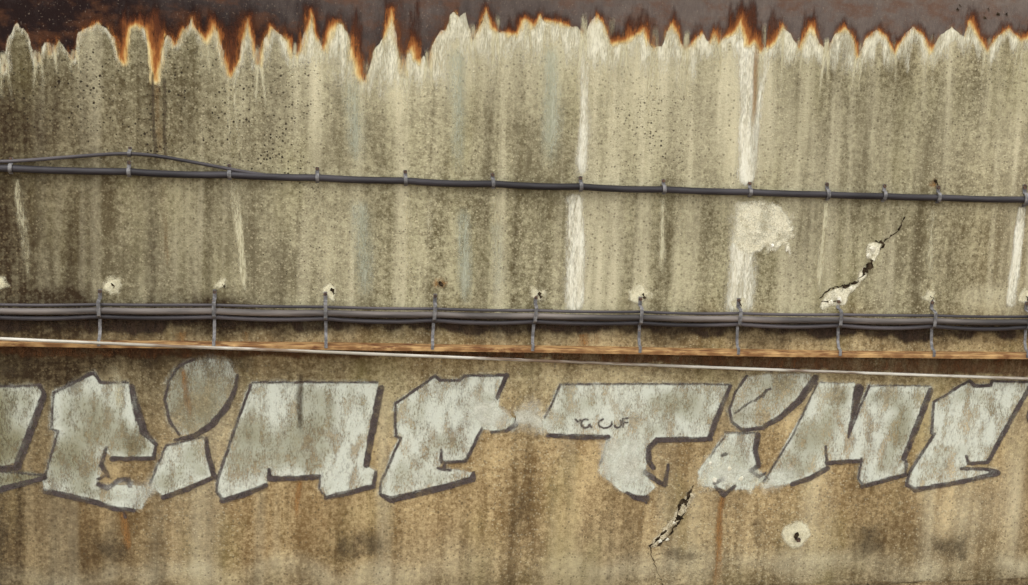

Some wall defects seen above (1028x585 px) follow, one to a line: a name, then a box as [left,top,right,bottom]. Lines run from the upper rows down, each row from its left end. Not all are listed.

water stain [0,23,120,84]
corrosion [113,5,366,85]
corrosion [478,4,570,37]
corrosion [590,1,784,53]
corrosion [837,20,934,59]
water stain [152,12,1028,185]
water stain [566,195,585,310]
water stain [727,203,755,311]
crack [819,217,905,303]
water stain [1007,207,1025,306]
crack [648,485,694,584]
spalling [782,521,810,547]